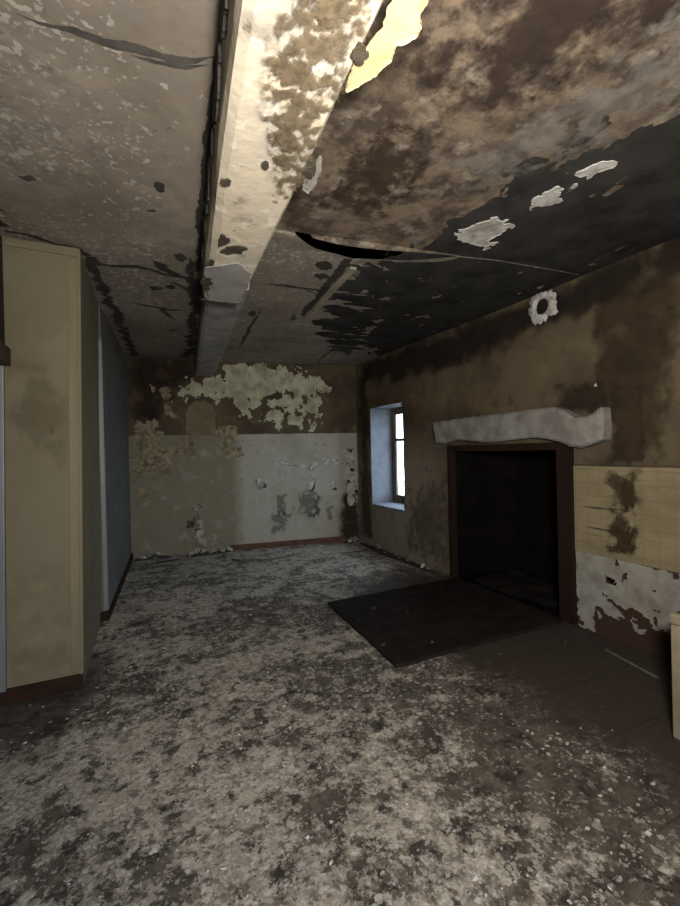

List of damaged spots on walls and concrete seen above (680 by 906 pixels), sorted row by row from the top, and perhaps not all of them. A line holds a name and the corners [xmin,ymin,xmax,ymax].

crack [16,13,213,70]
water stain [262,0,372,198]
water stain [395,35,462,88]
water stain [457,0,680,190]
peeling [180,0,252,358]
water stain [318,122,428,218]
peeling [129,362,332,483]
water stain [613,387,643,460]
water stain [607,472,638,553]
peeling [576,551,680,636]